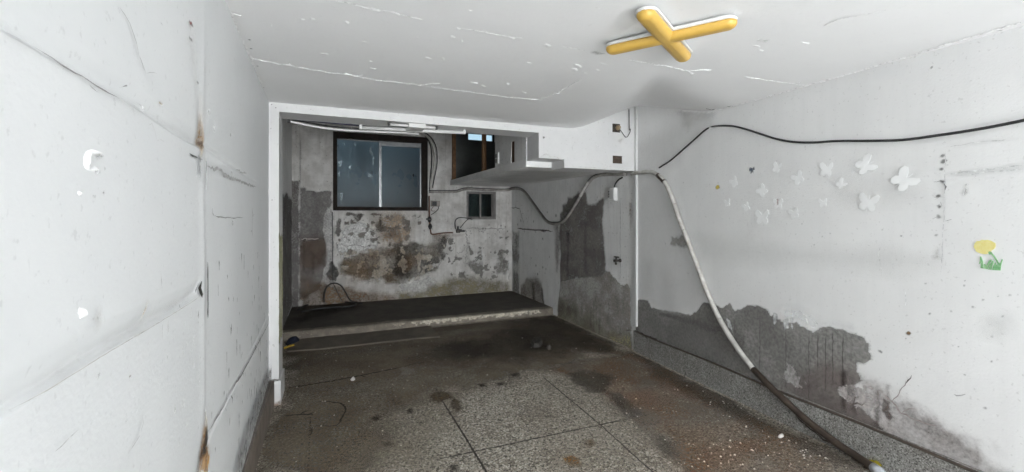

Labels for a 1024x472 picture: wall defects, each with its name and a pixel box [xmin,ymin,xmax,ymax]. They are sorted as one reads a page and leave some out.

crack [3,8,157,98]
peeling [279,181,540,342]
peeling [558,193,892,430]
corrosion [199,426,209,472]